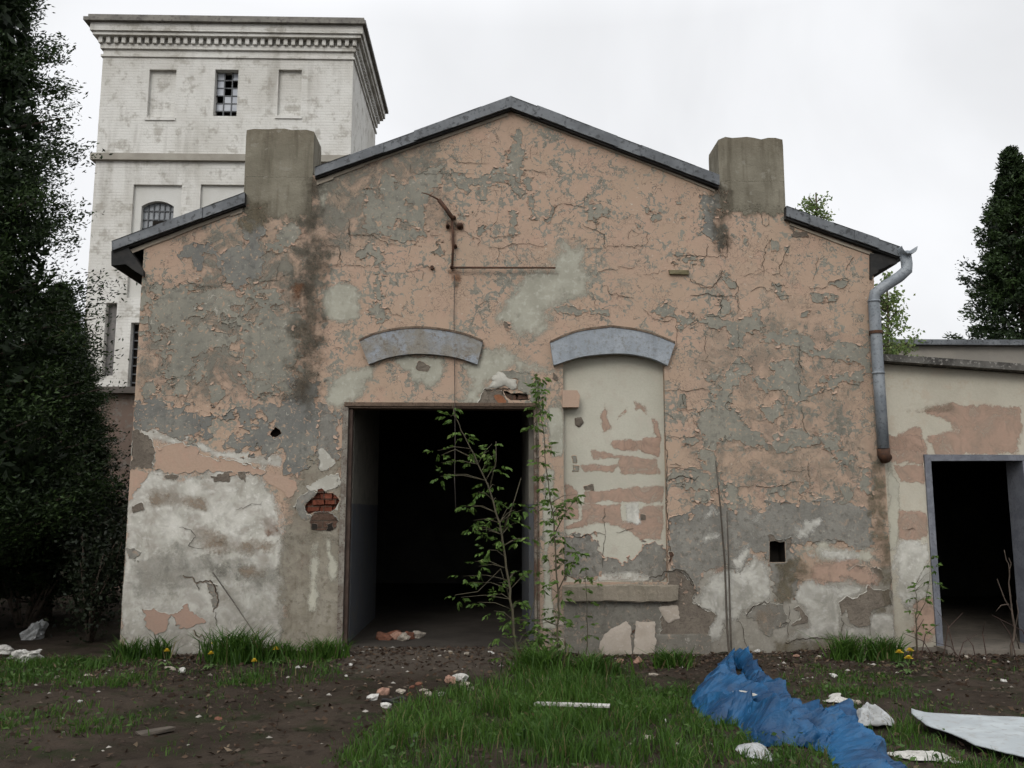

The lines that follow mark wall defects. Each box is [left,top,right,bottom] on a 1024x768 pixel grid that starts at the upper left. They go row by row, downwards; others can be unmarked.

damp [138,141,441,403]
crack [323,195,401,281]
peeling [321,129,557,324]
crack [463,218,543,265]
flaking render [496,241,610,337]
peeling [670,251,705,267]
flaking render [675,181,785,252]
peeling [121,176,375,655]
flaking render [395,355,444,388]
peeling [462,270,931,653]
crack [649,388,871,646]
crack [183,575,219,638]